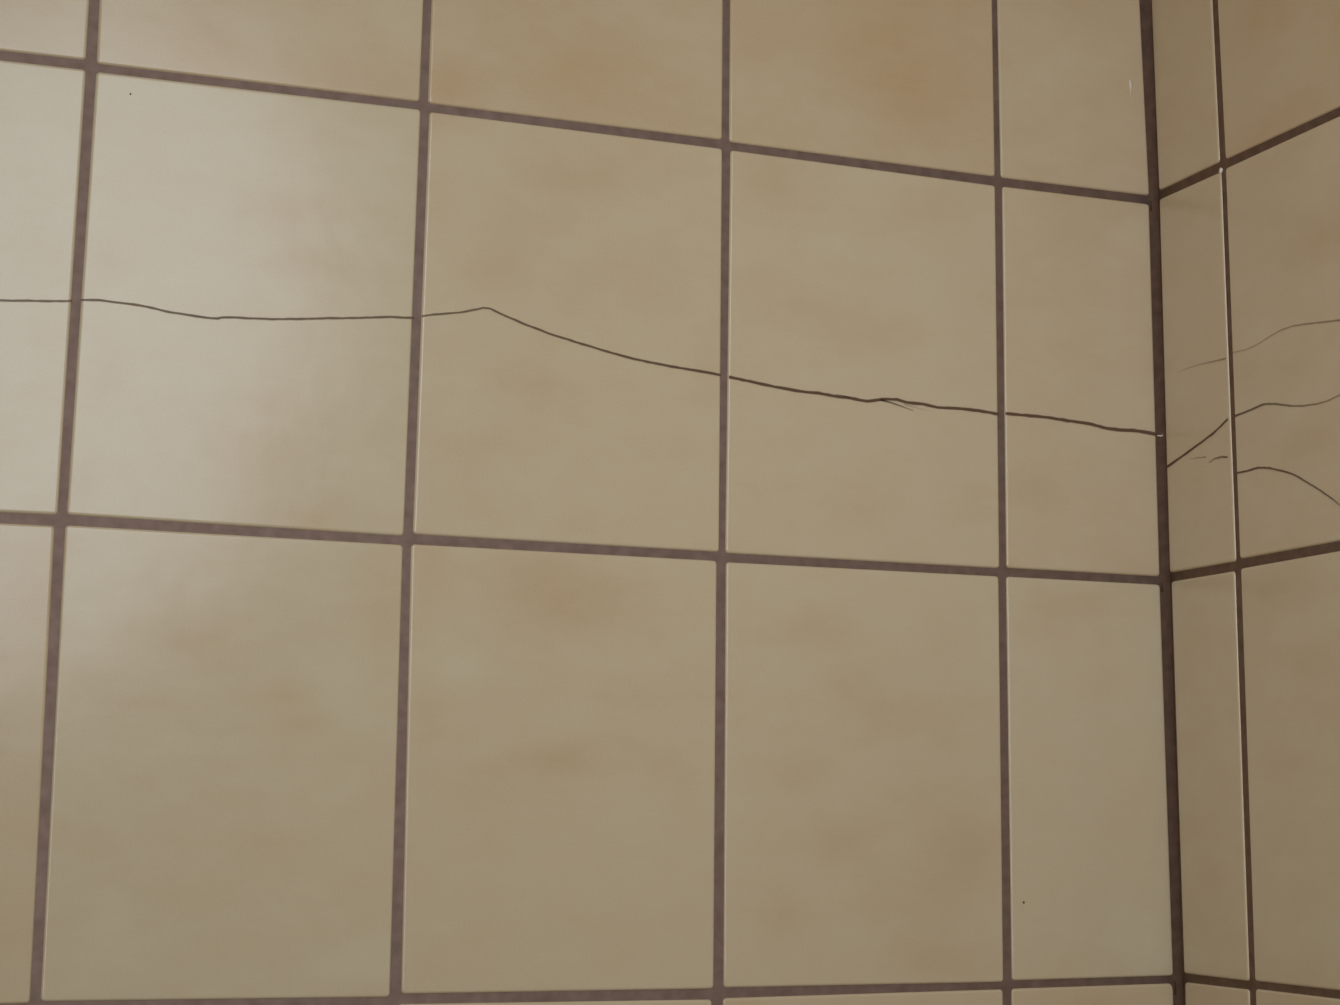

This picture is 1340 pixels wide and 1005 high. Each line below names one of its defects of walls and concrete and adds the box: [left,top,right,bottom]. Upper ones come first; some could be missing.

crack [0,299,1338,504]